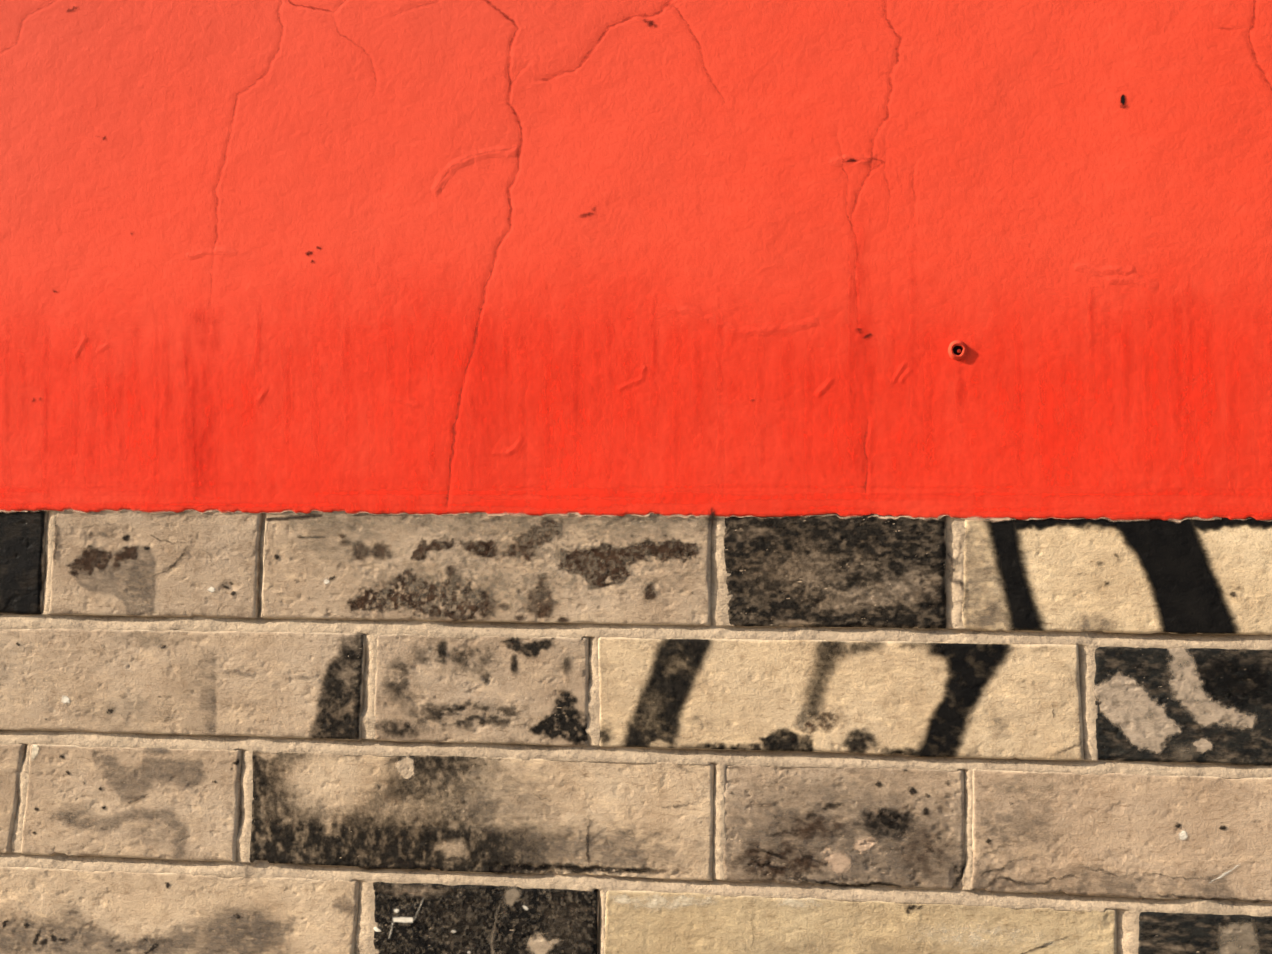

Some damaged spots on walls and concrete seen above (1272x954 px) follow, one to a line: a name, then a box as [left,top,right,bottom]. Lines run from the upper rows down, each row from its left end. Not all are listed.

crack [543,3,668,80]
crack [447,1,522,500]
water stain [0,326,1272,615]
water stain [726,789,956,887]